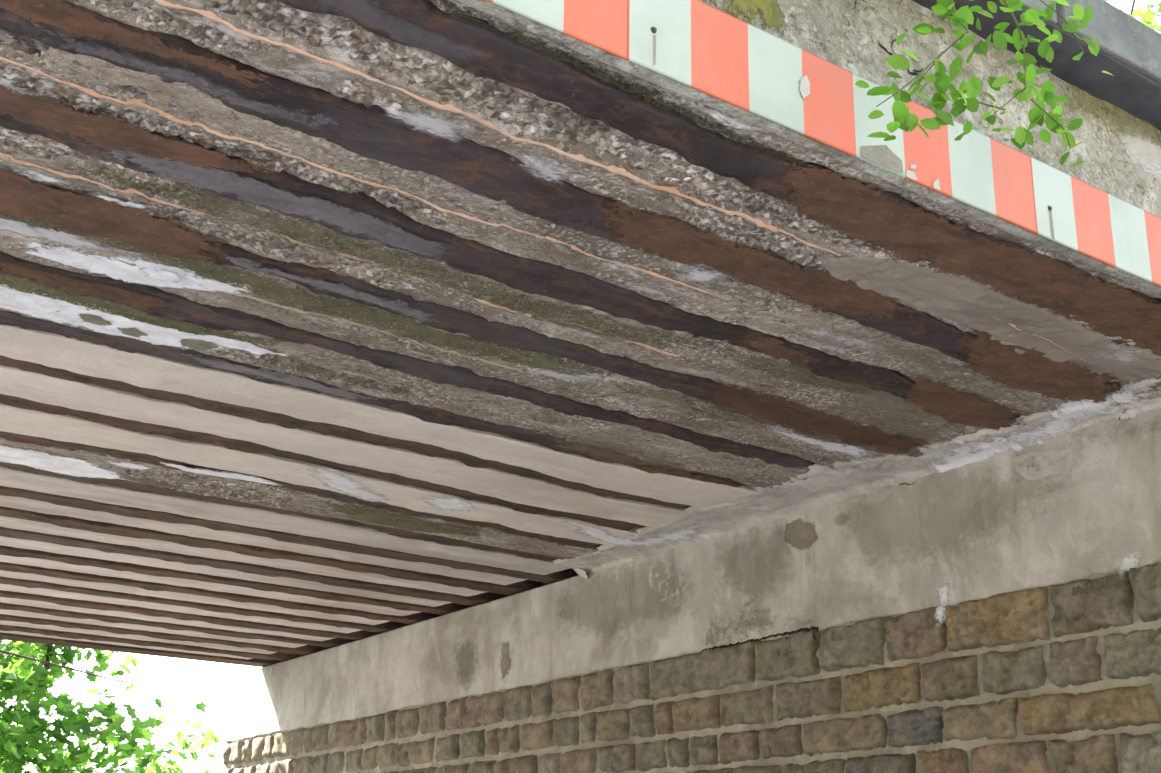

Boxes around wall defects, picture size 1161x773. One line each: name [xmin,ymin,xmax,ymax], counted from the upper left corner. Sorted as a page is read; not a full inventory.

peeling [0,21,349,138]
corrosion [0,85,275,181]
spalling [203,0,885,272]
corrosion [0,170,230,265]
leakage [0,216,262,294]
peeling [0,67,457,324]
corrosion [586,189,911,326]
corrosion [767,160,1161,356]
leakage [0,284,288,357]
leakage [0,445,281,486]
leakage [925,389,1156,473]
crack [701,626,819,652]